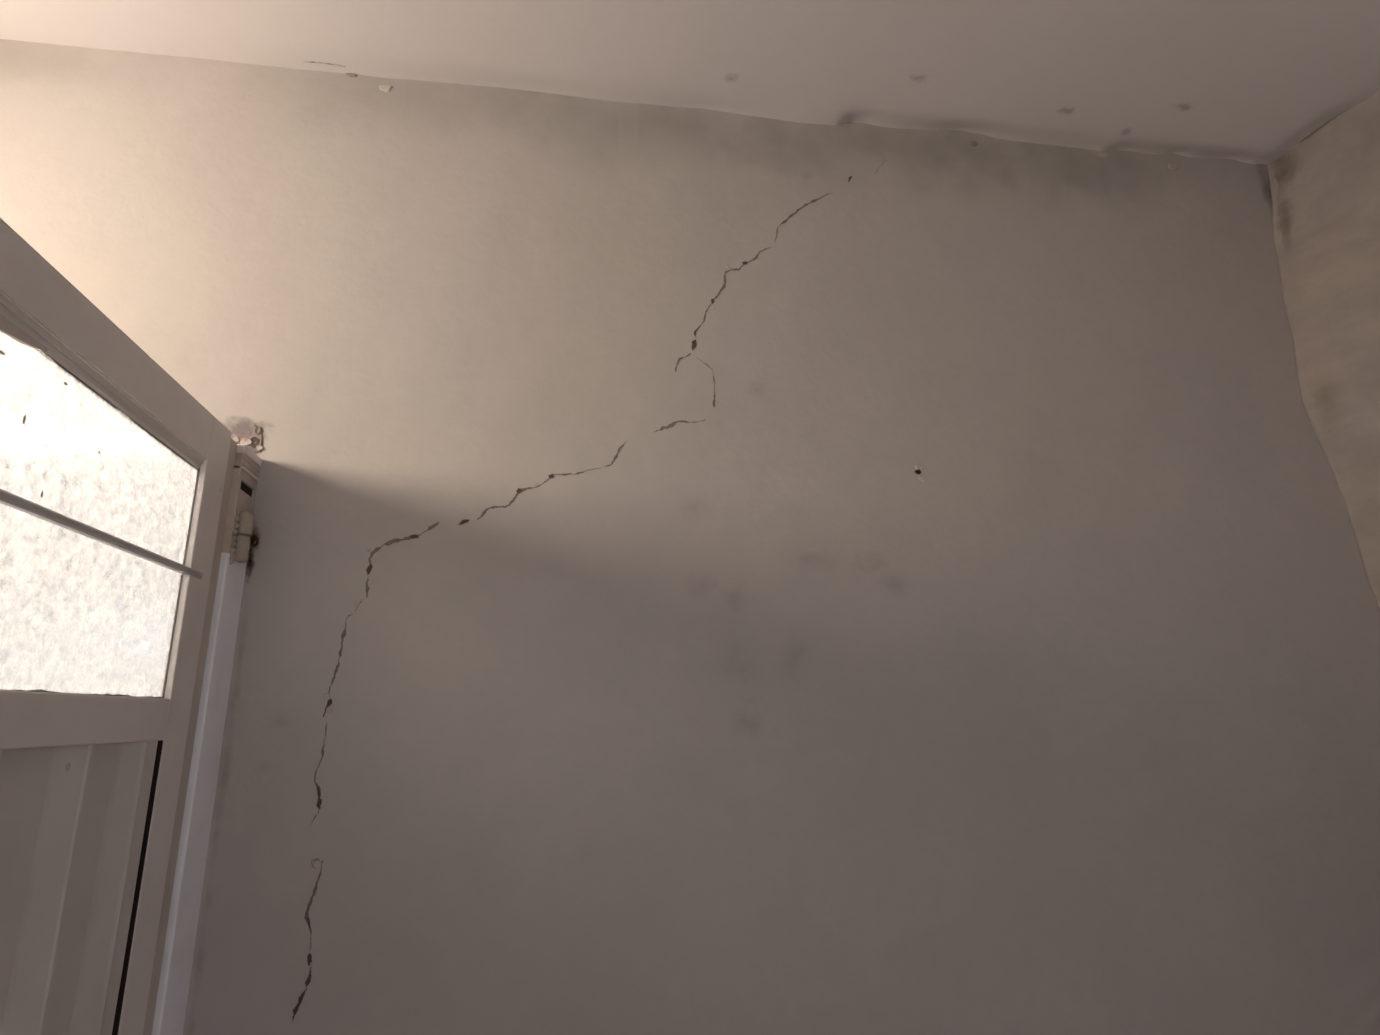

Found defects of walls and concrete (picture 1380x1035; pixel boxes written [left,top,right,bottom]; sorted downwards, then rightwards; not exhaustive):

crack [654,158,886,432]
crack [312,444,624,823]
crack [292,858,323,1022]